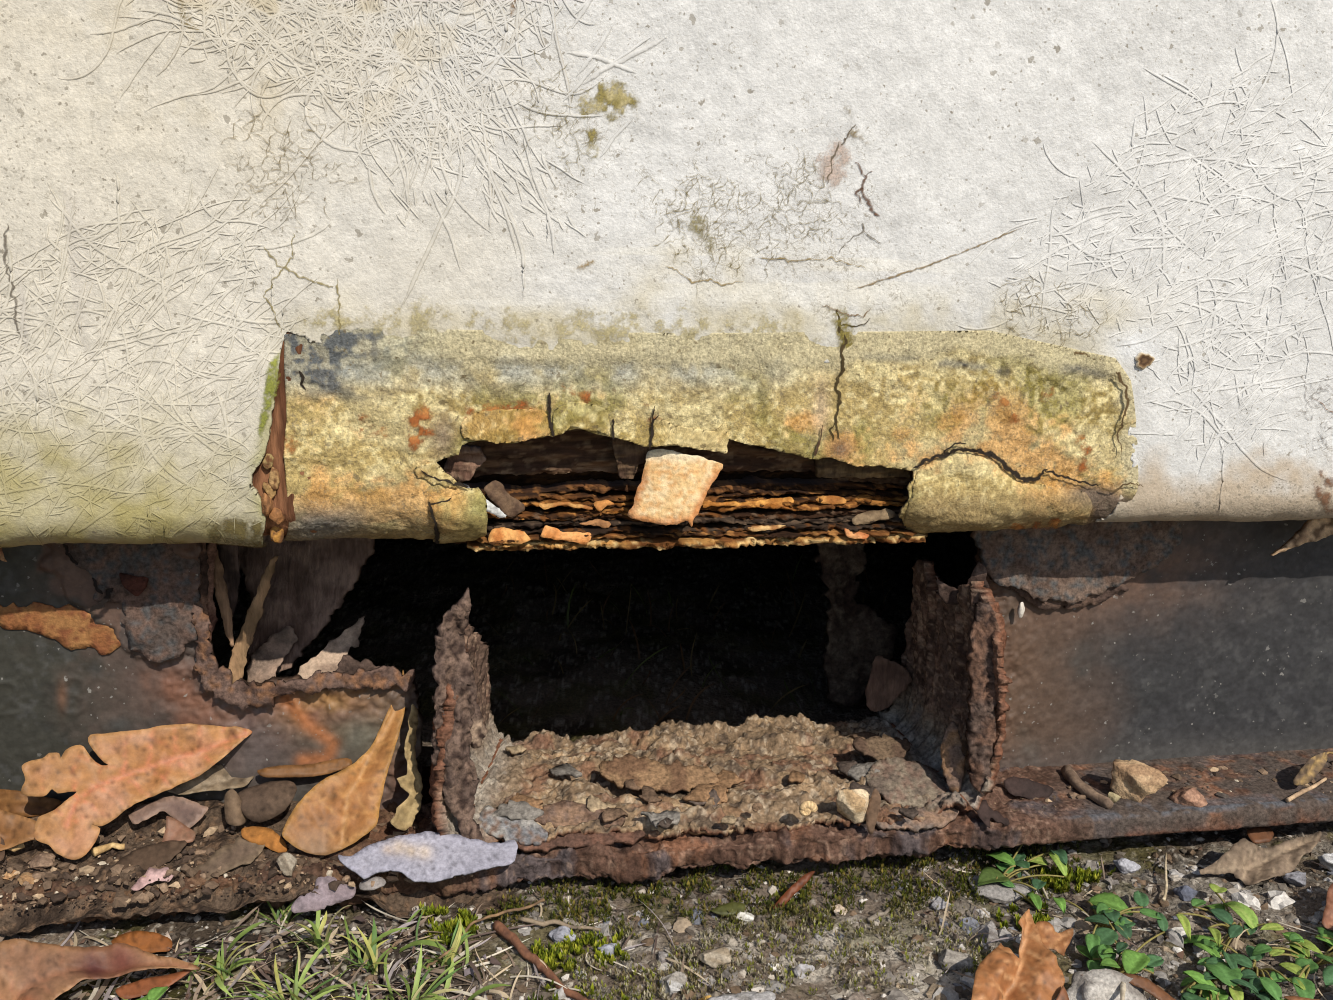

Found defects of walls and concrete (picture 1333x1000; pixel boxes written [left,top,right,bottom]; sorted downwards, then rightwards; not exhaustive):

water stain [557,311,788,342]
crack [639,125,1021,456]
crack [913,269,1143,492]
peeling [650,419,729,453]
peeling [414,462,591,546]
peeling [844,528,869,539]
rust [1316,471,1333,512]
rust [813,542,898,707]
rust [431,587,751,853]